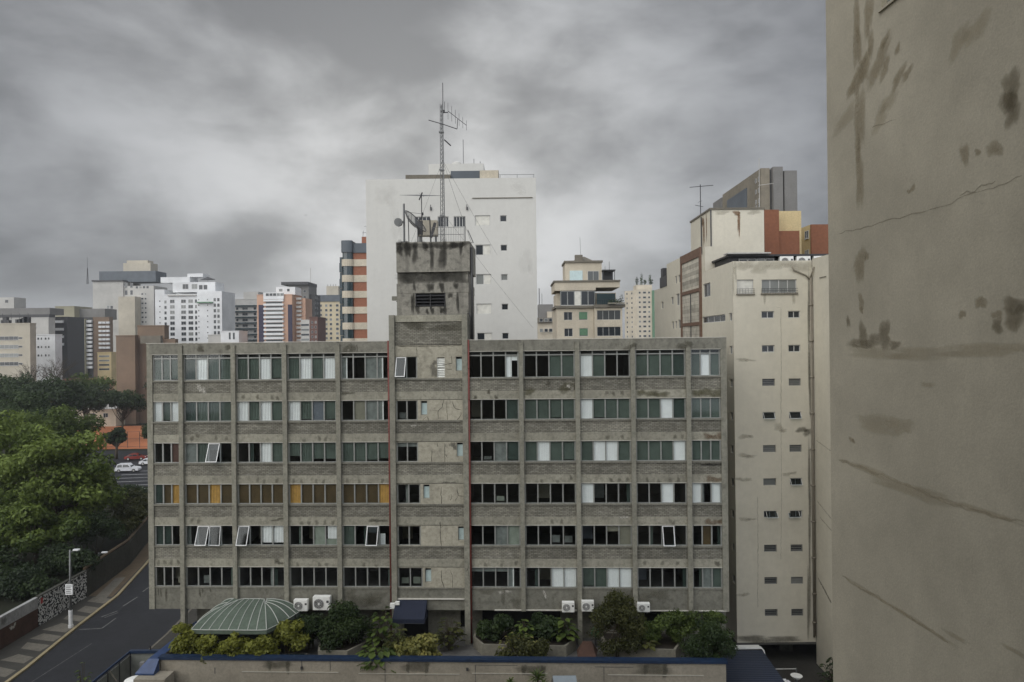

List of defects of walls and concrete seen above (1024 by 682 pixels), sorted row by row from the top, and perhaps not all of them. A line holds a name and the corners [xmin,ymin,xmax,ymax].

damp [397,241,466,328]